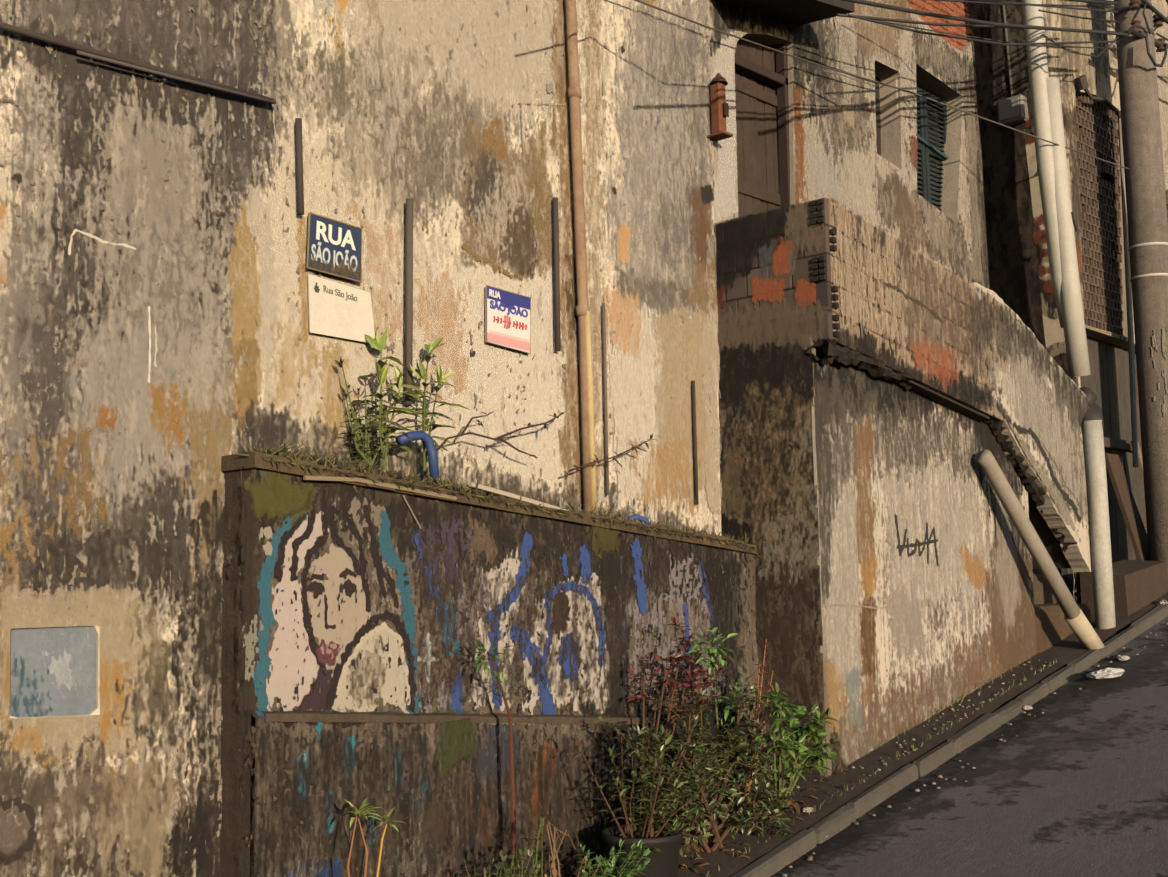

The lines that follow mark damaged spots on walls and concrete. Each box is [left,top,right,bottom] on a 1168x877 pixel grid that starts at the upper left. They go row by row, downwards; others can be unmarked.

damp [0,0,582,877]
damp [143,0,1033,877]
flaking render [907,0,972,51]